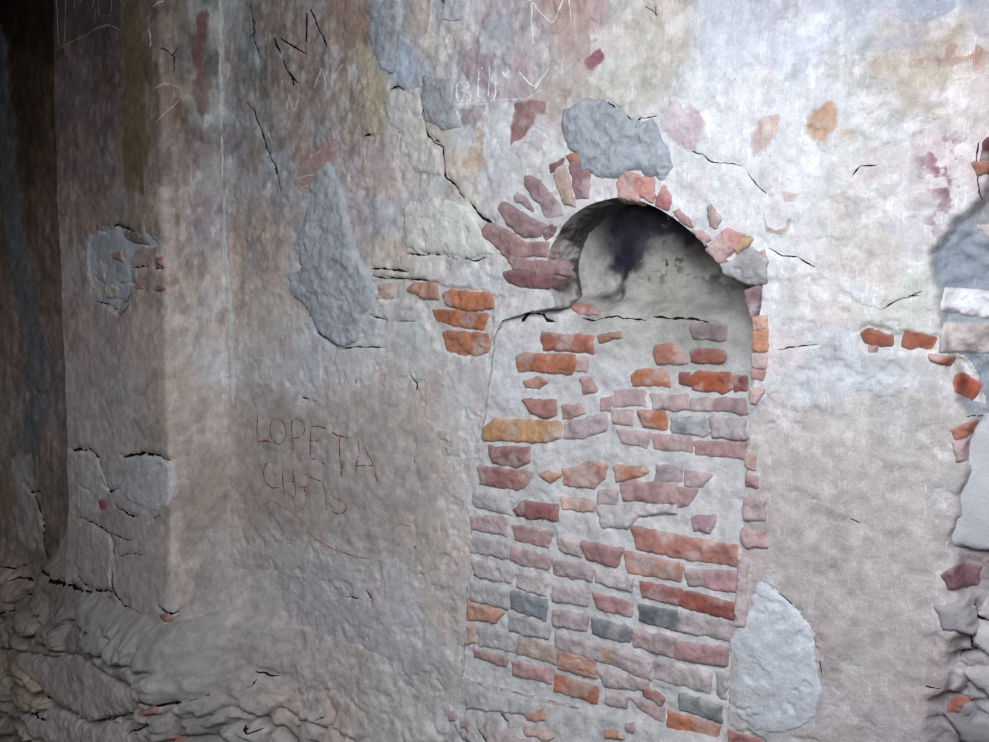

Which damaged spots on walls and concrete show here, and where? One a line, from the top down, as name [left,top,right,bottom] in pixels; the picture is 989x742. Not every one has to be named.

crack [250,5,261,59]
crack [246,102,281,190]
crack [422,109,492,223]
spalling [971,136,989,177]
spalling [86,184,185,314]
peeling [402,198,495,260]
spalling [373,276,504,361]
crack [73,447,171,461]
crack [0,485,179,615]
spalling [851,287,989,742]
spalling [726,726,765,742]